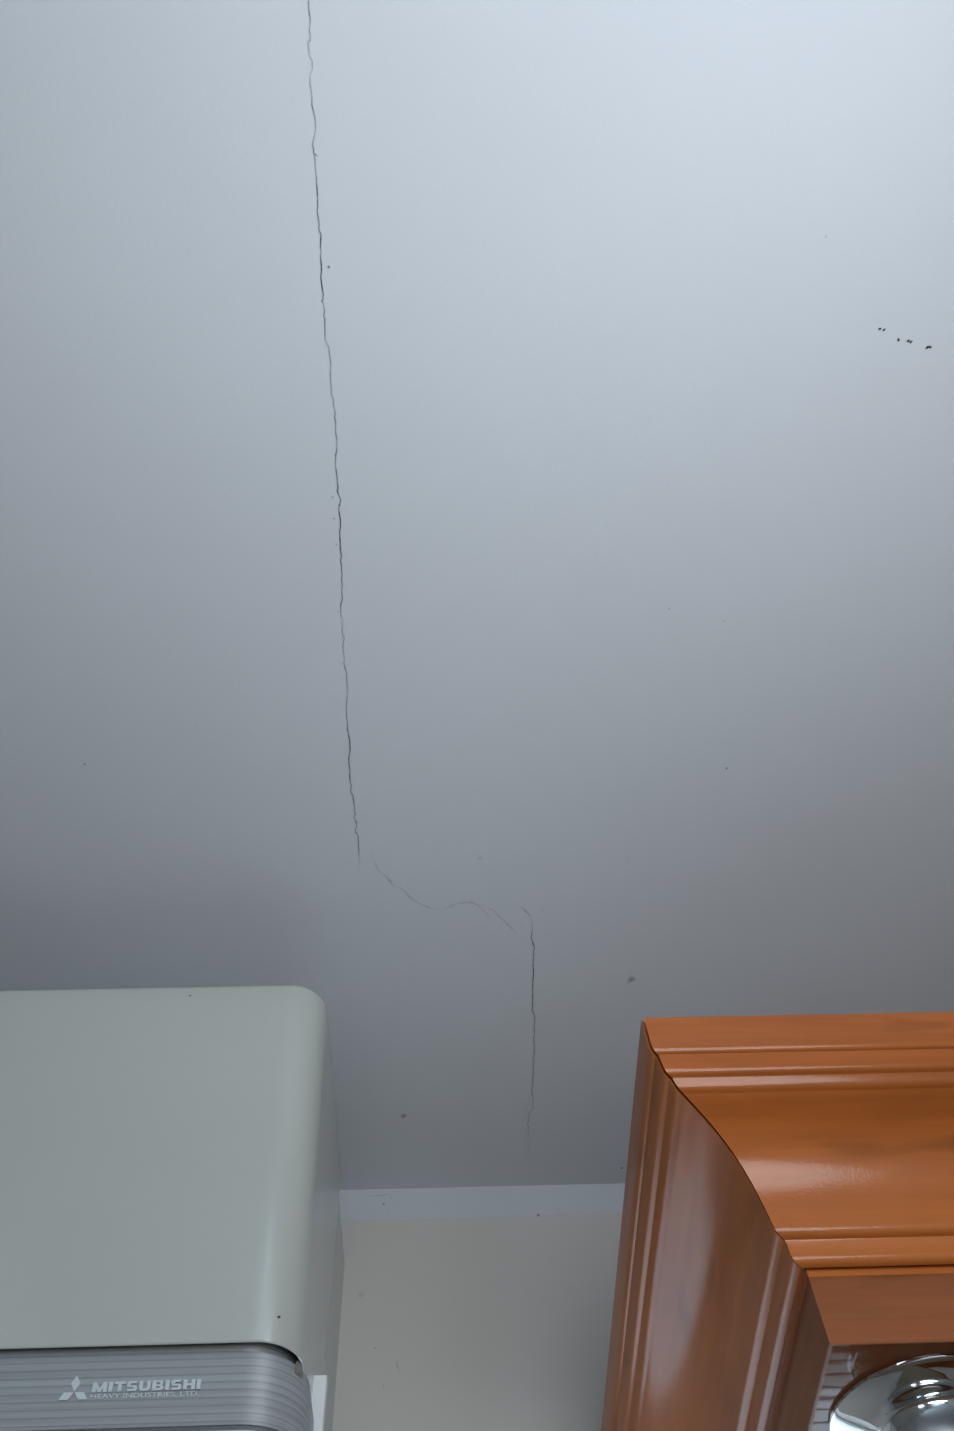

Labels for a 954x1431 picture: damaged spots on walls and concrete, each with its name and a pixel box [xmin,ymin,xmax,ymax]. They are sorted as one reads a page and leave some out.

crack [313,150,325,314]
crack [334,450,343,607]
crack [529,934,537,1014]